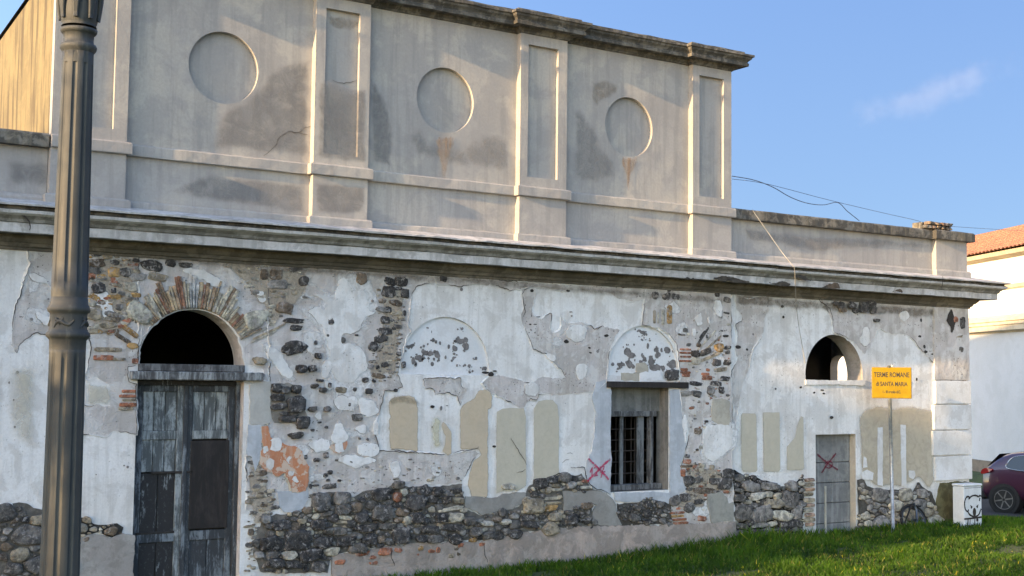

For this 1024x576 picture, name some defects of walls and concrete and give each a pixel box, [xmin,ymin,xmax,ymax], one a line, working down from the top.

peeling [84,254,785,572]
peeling [820,300,960,364]